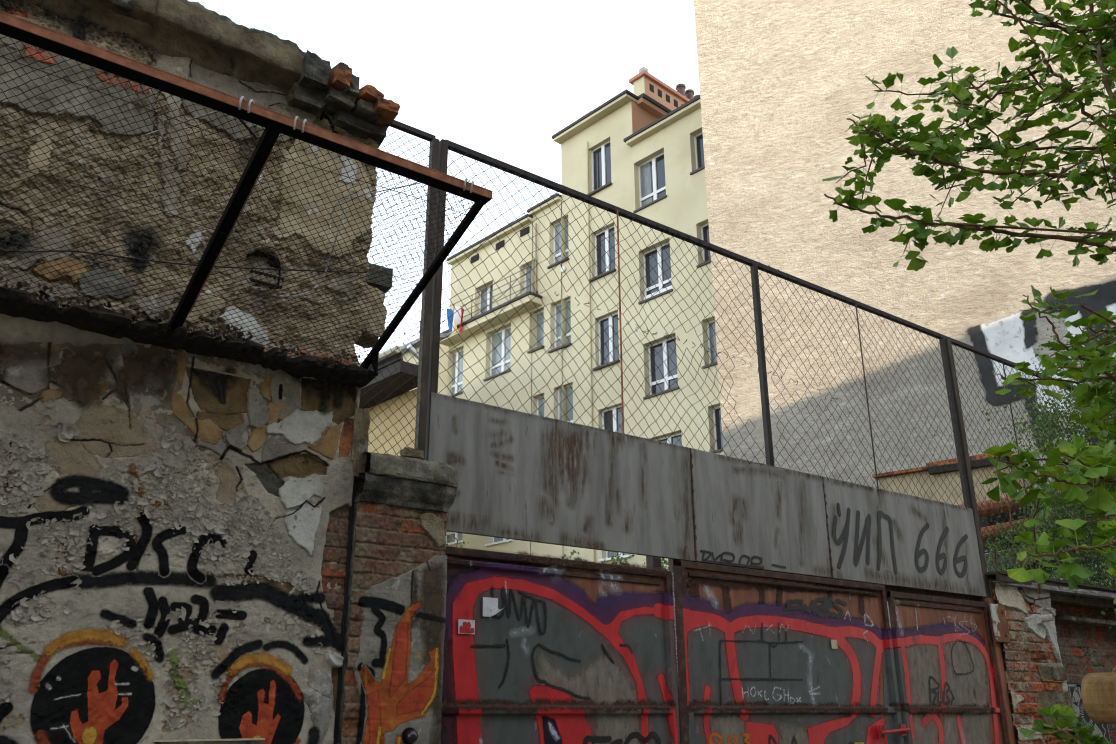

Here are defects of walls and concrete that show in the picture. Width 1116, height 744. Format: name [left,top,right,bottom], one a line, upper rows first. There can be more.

peeling [0,34,265,218]
peeling [0,228,181,320]
peeling [185,288,269,348]
peeling [325,273,360,300]
corrosion [542,419,594,519]
peeling [0,341,447,744]
corrosion [442,698,994,714]
peeling [995,582,1072,744]